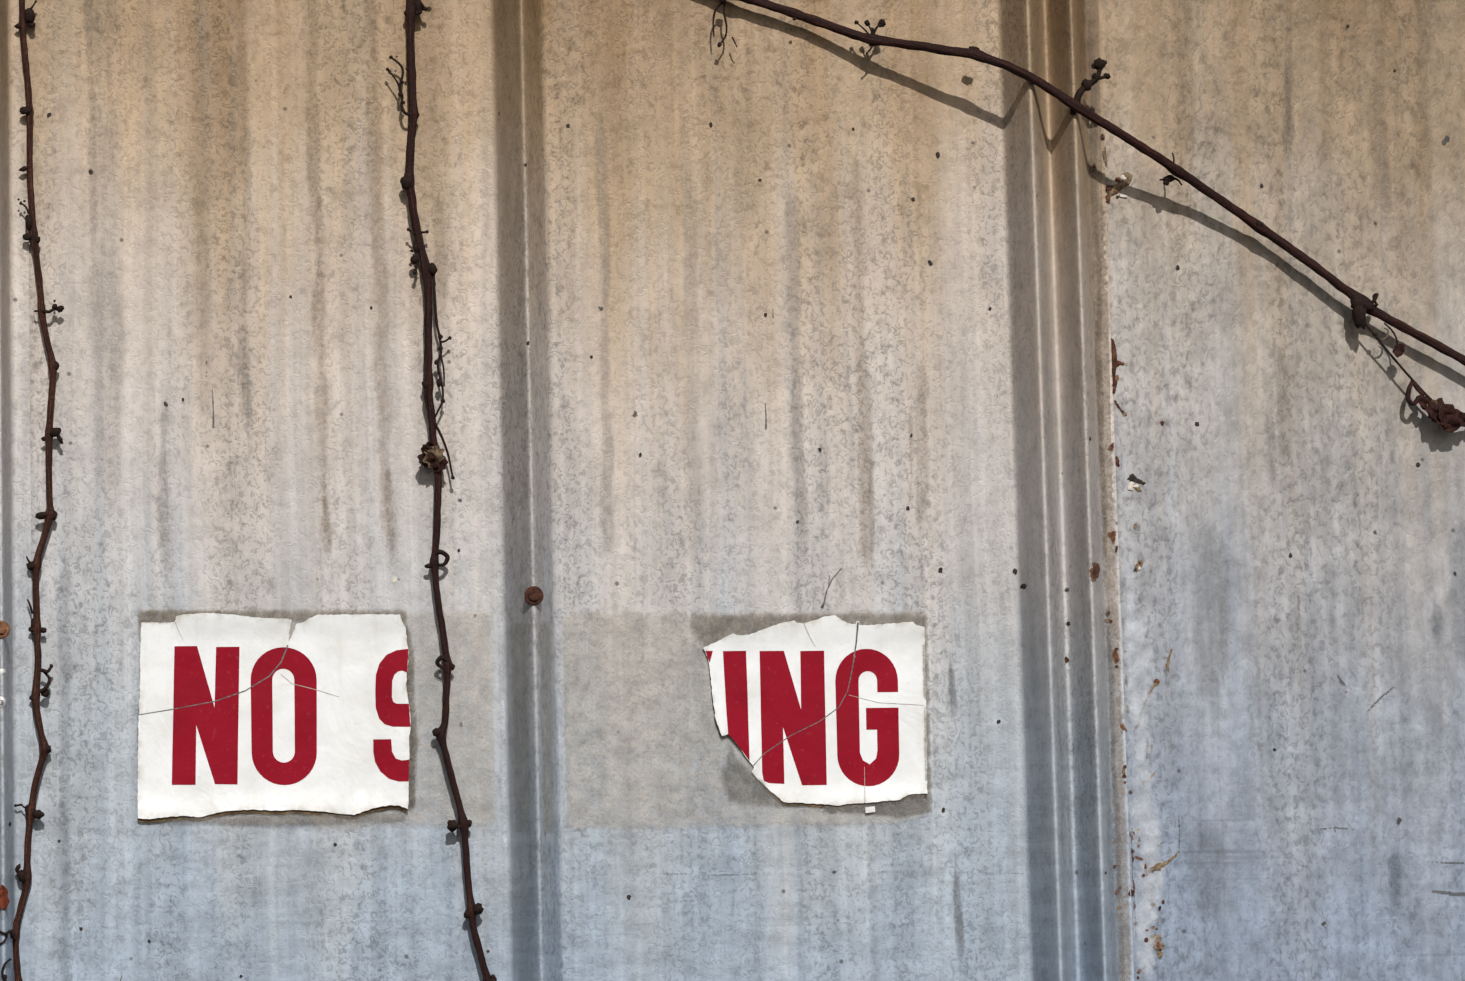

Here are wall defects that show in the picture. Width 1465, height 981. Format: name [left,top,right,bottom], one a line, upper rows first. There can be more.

corrosion [1089,562,1100,582]
corrosion [1112,648,1129,685]
corrosion [1105,828,1165,979]